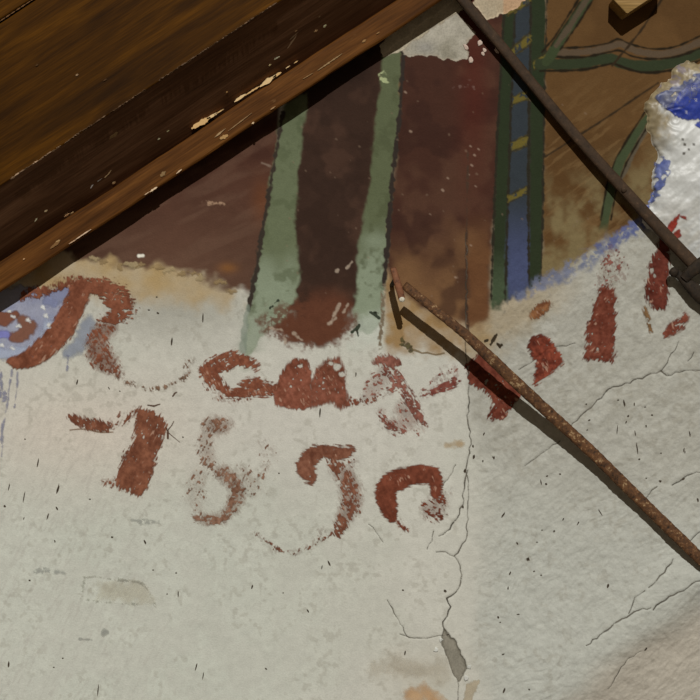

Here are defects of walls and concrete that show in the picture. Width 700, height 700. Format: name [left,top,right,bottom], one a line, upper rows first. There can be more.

crack [572,344,694,424]
crack [387,235,472,638]
crack [586,560,700,646]
flaking render [434,629,479,700]